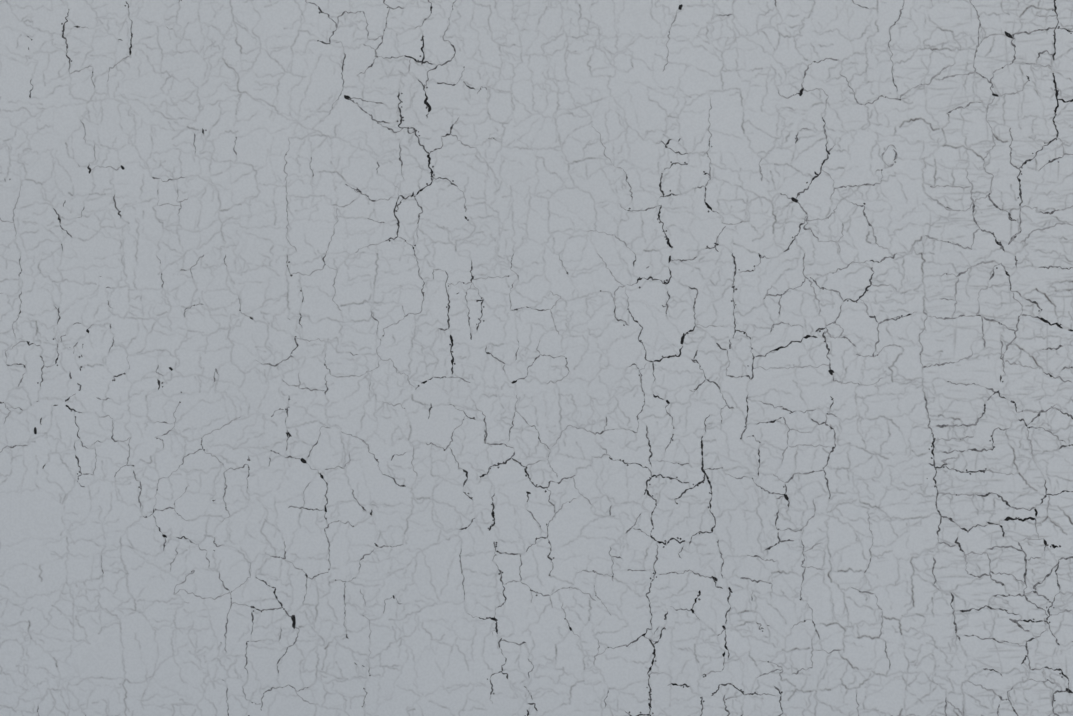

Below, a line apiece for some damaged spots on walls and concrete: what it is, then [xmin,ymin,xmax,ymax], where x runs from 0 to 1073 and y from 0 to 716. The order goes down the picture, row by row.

crack [61,2,133,88]
crack [0,179,21,236]
crack [53,202,84,251]
crack [79,120,124,217]
crack [152,177,188,216]
crack [256,0,1073,716]
crack [0,255,313,716]